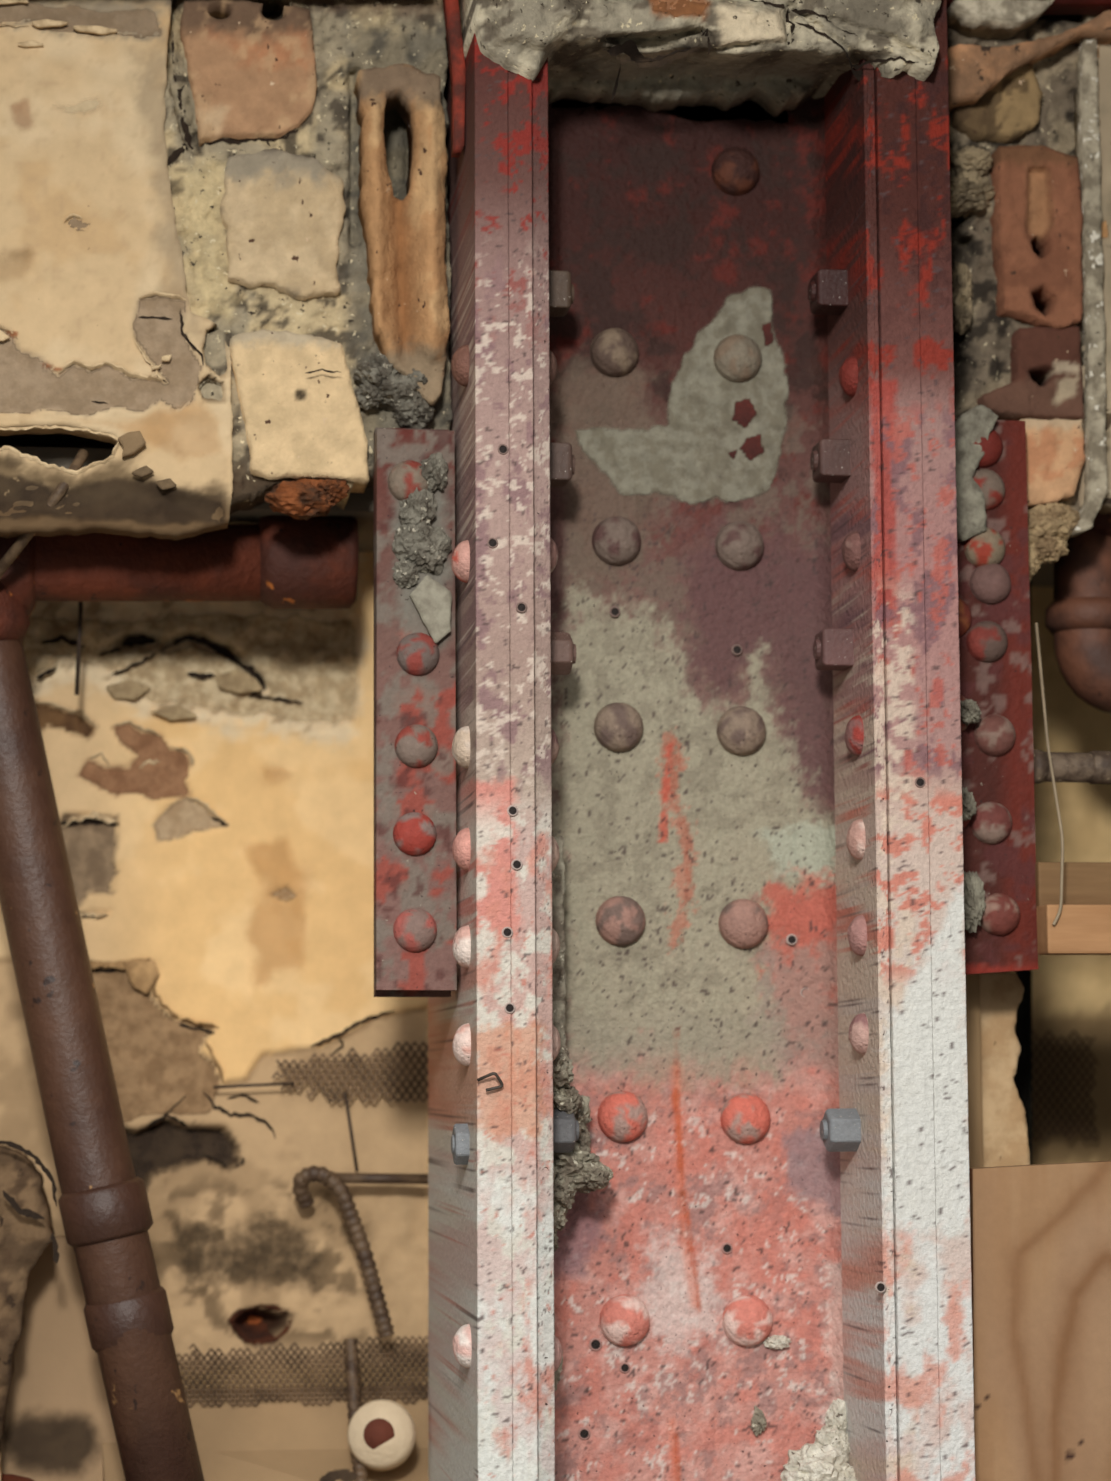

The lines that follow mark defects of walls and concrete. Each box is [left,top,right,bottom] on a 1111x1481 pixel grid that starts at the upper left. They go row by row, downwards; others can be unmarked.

crack [604,29,712,101]
spalling [458,0,941,123]
crack [750,0,917,81]
peeling [0,291,221,415]
peeling [576,287,789,504]
flaking render [0,431,222,524]
crack [37,634,303,704]
spalling [22,615,356,840]
peeling [61,811,119,918]
flaking render [272,887,295,901]
crack [311,1011,394,1054]
crack [163,1092,275,1137]